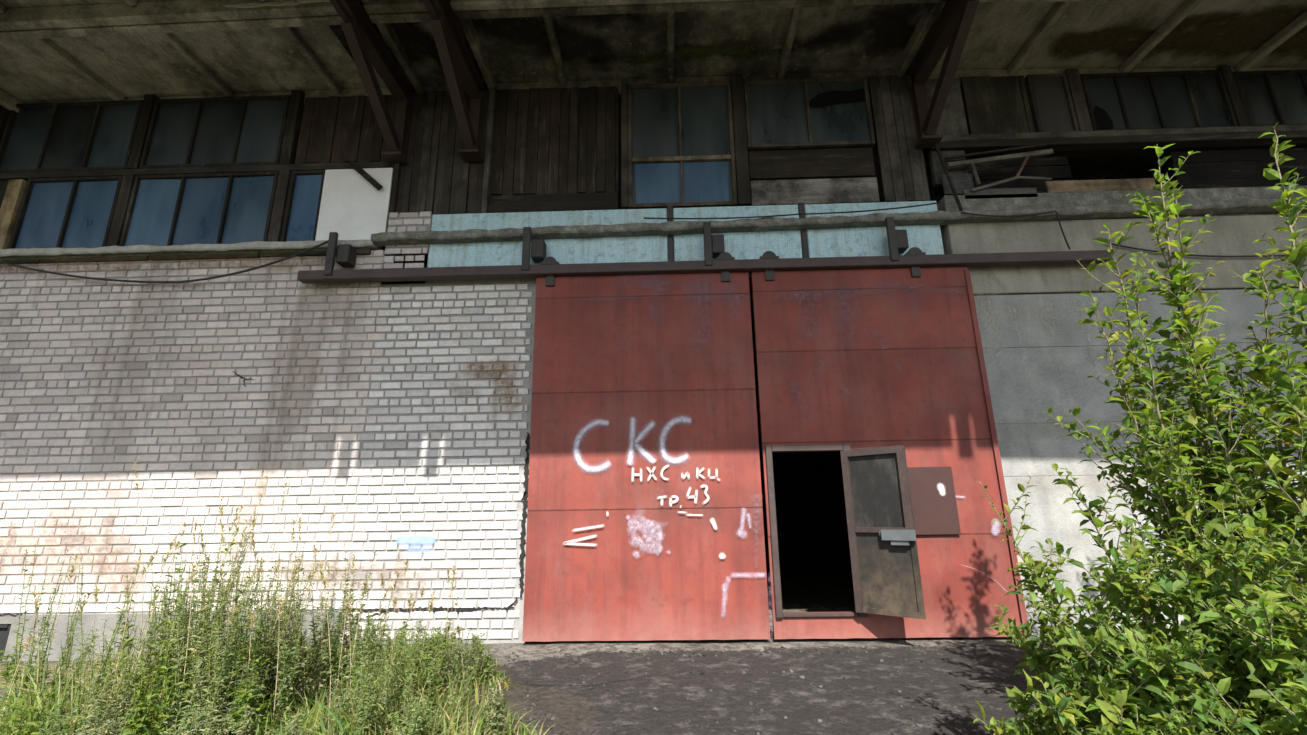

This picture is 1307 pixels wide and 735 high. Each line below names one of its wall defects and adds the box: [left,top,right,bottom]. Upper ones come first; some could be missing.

water stain [1051,6,1307,59]